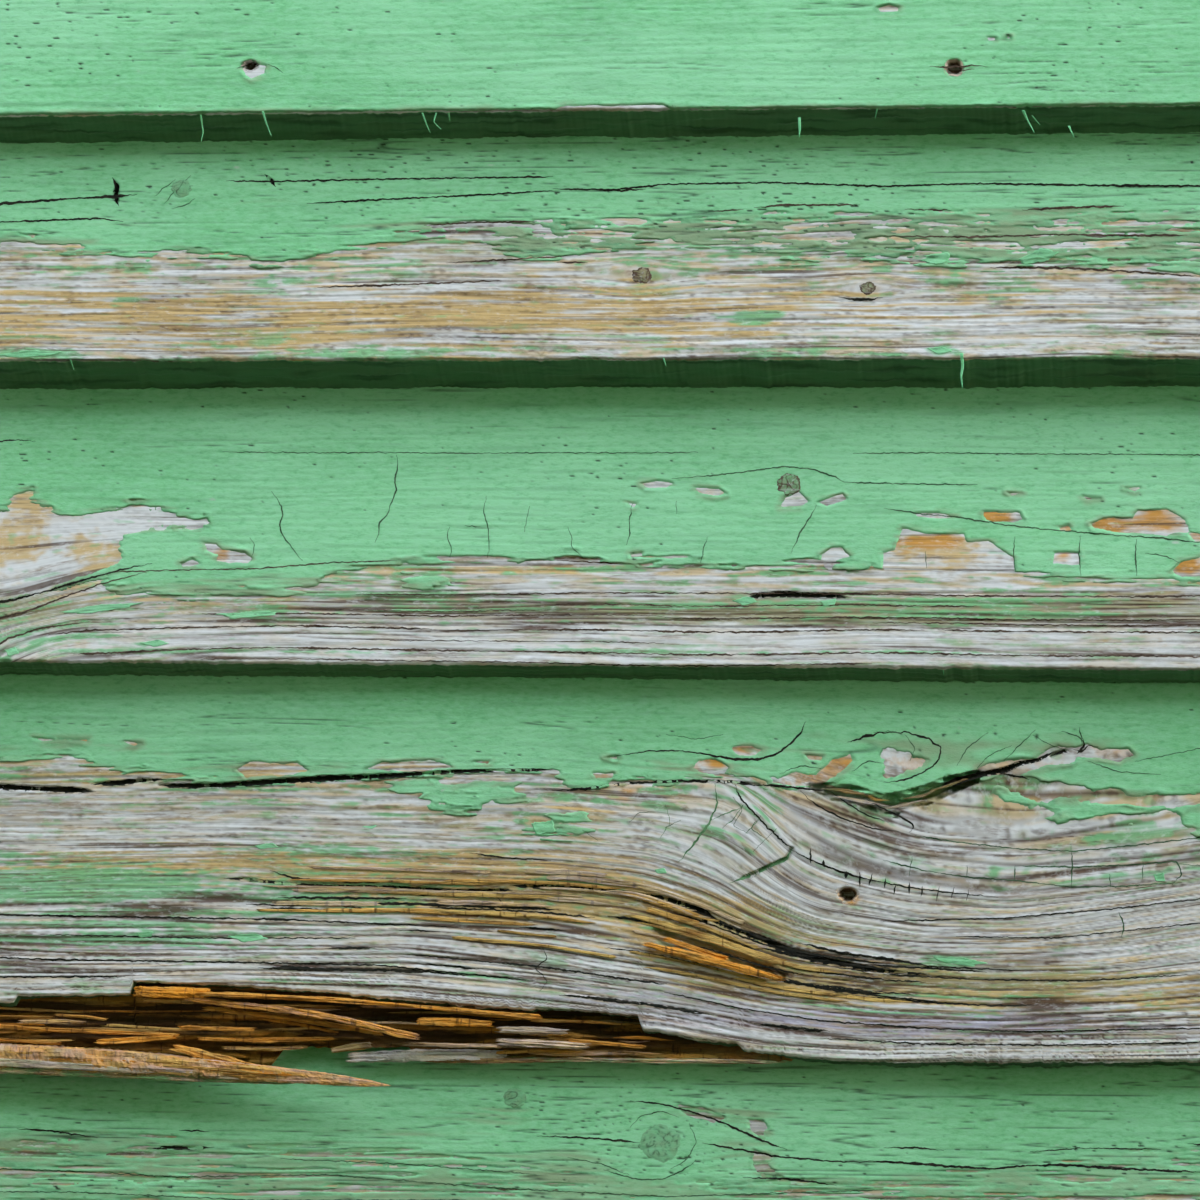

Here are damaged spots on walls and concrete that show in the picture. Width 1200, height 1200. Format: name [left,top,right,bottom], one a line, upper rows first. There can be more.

crack [0,175,194,223]
peeling [0,209,1200,363]
peeling [0,491,1200,671]
peeling [696,488,724,496]
crack [0,723,1200,939]
peeling [0,738,1200,1064]
crack [0,853,1200,1046]